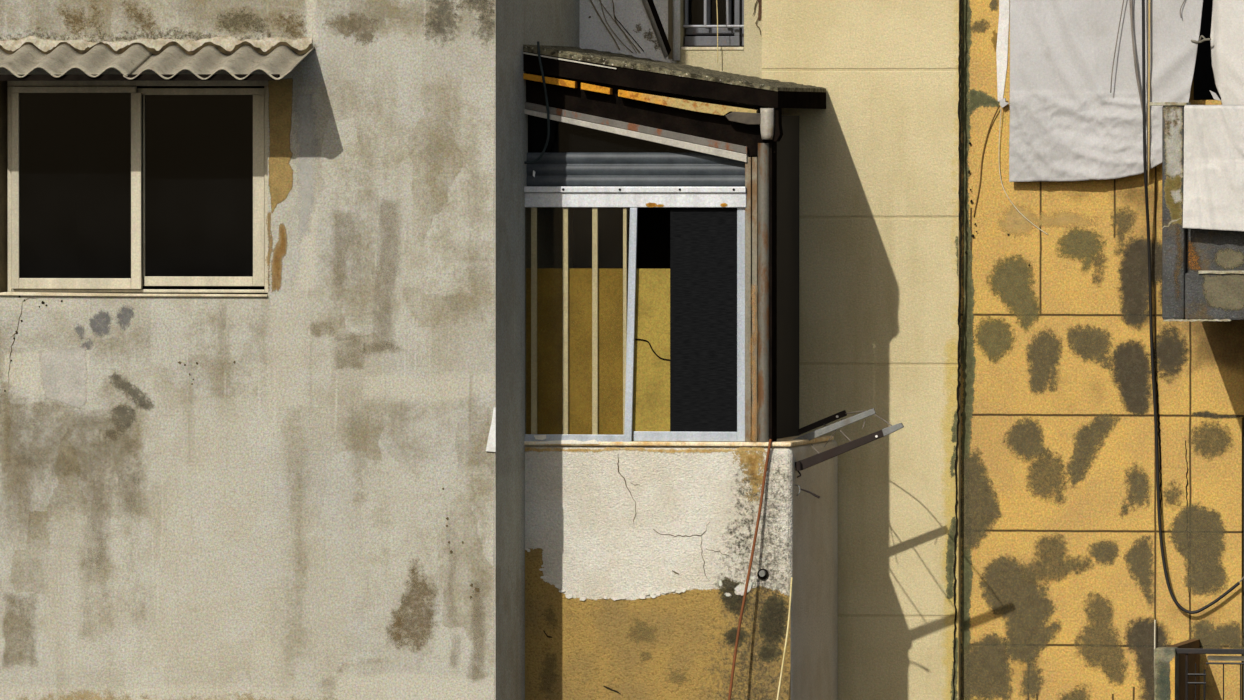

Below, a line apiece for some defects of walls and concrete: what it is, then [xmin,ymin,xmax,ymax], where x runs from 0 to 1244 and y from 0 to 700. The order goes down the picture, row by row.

water stain [0,1,317,51]
flaking render [268,78,293,213]
peeling [1163,106,1183,225]
crack [8,298,37,382]
water stain [945,0,1191,700]
water stain [1190,421,1232,459]
water stain [386,564,436,650]
peeling [525,548,791,700]
crack [617,458,726,581]
water stain [713,461,791,700]
water stain [1120,463,1229,596]
water stain [1190,620,1243,649]